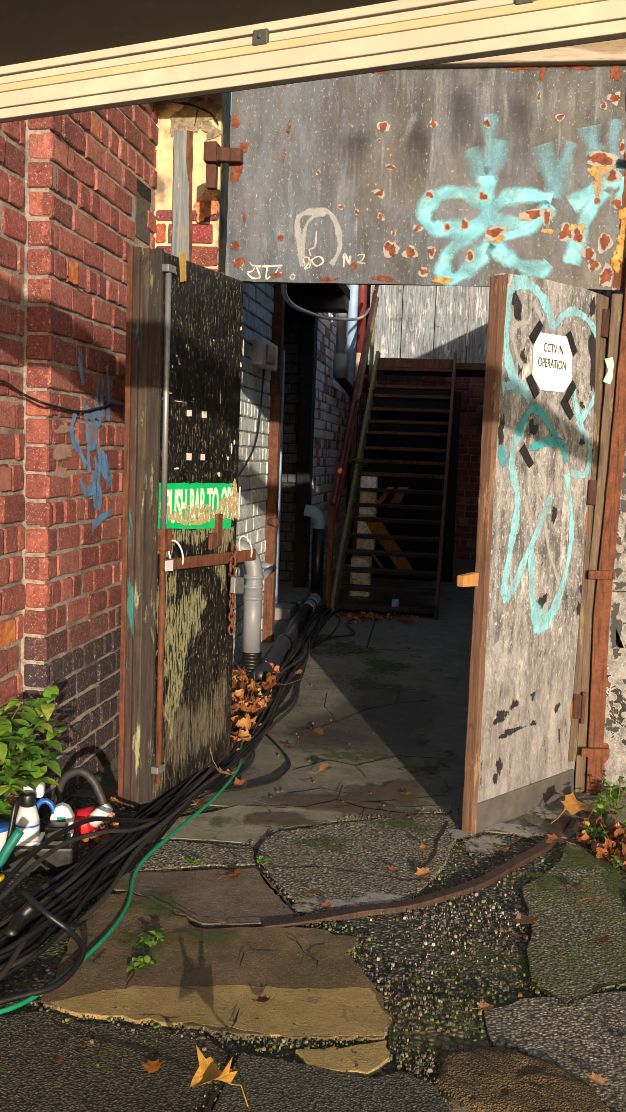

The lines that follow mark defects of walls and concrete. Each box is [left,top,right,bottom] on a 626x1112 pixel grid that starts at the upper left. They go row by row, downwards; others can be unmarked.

corrosion [508,65,593,102]
corrosion [600,64,626,110]
corrosion [377,121,390,143]
corrosion [373,189,452,285]
corrosion [444,217,469,232]
corrosion [485,226,507,243]
corrosion [518,139,626,290]
peeling [608,445,626,660]
peeling [605,700,620,733]